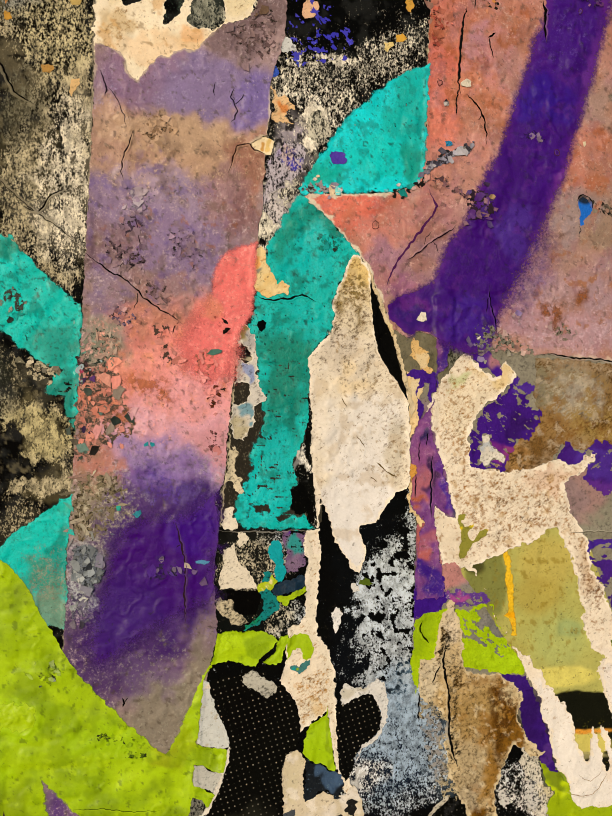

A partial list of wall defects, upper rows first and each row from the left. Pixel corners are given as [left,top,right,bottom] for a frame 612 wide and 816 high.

crack [213,84,244,122]
peeling [224,5,280,71]
crack [455,0,489,145]
peeling [384,139,499,228]
crack [387,193,456,284]
crack [84,252,182,334]
peeling [99,181,229,461]
peeling [15,356,61,385]
peeling [59,298,141,629]
crack [175,523,188,622]
crack [416,622,458,767]